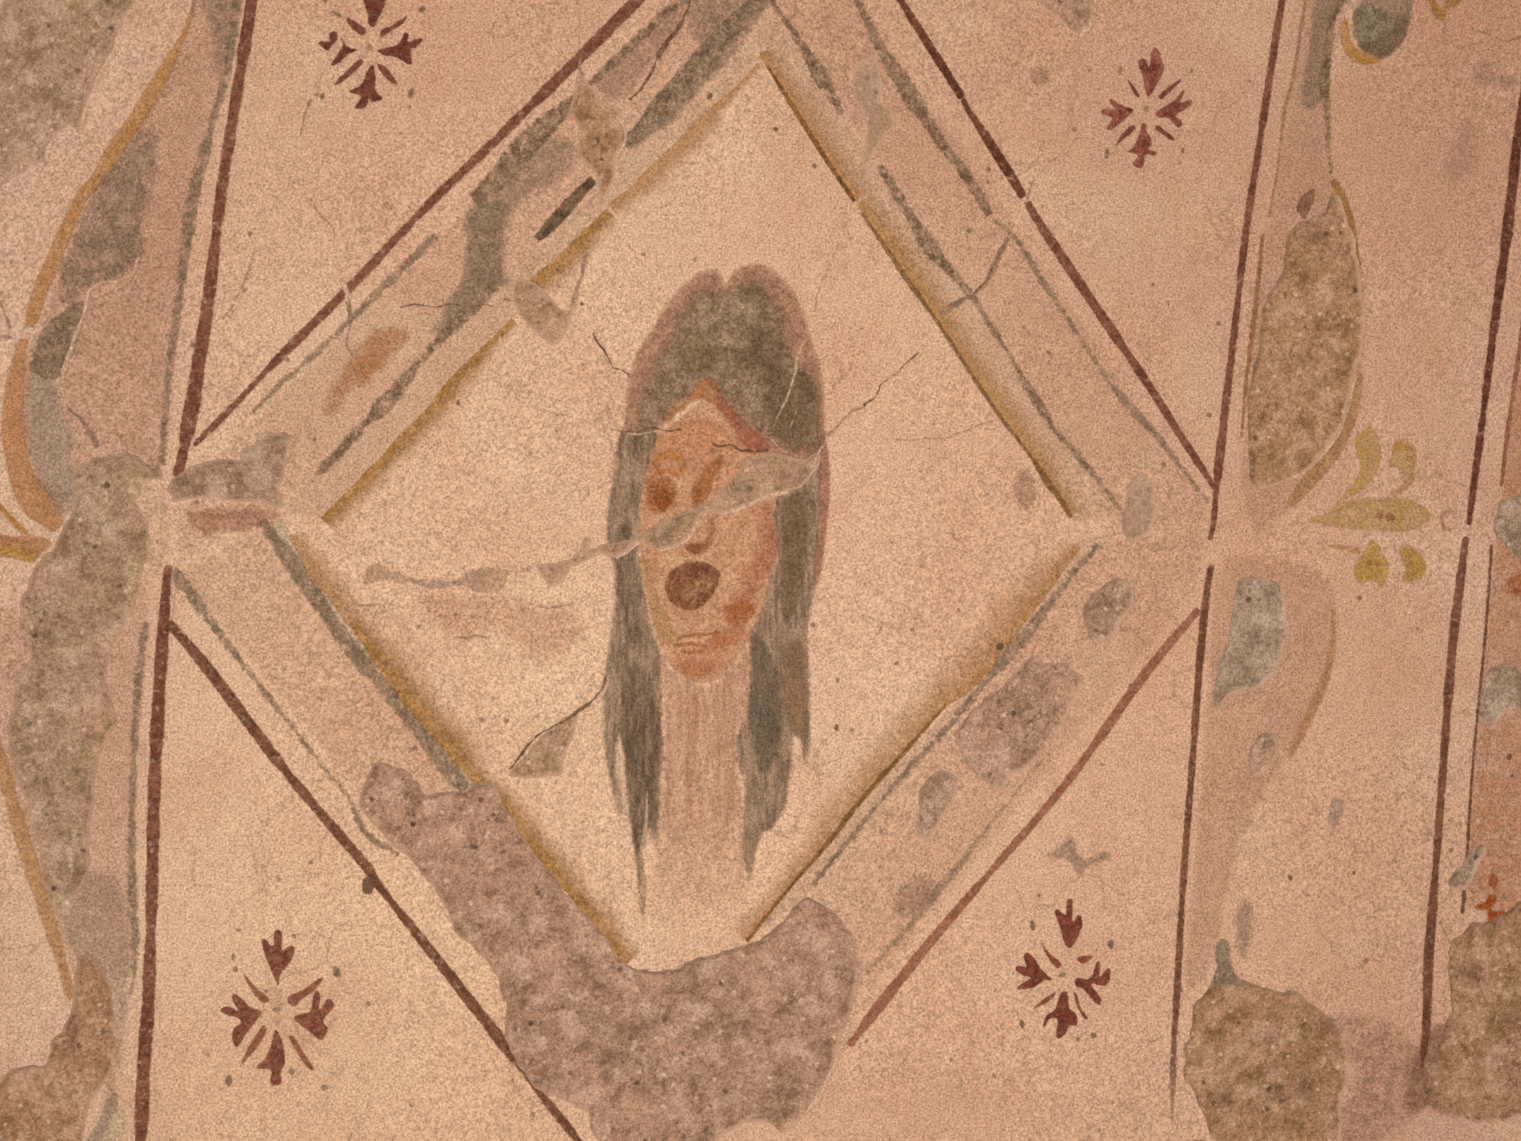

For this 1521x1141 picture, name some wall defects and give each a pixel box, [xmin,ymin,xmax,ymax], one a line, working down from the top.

flaking render [0,0,135,189]
flaking render [1034,0,1097,38]
flaking render [1247,189,1366,489]
flaking render [1494,492,1521,560]
flaking render [7,432,291,915]
flaking render [915,655,1082,840]
flaking render [1212,577,1289,710]
flaking render [0,951,124,1141]
flaking render [359,714,863,1141]
flaking render [1183,939,1353,1141]
flaking render [1423,900,1521,1124]